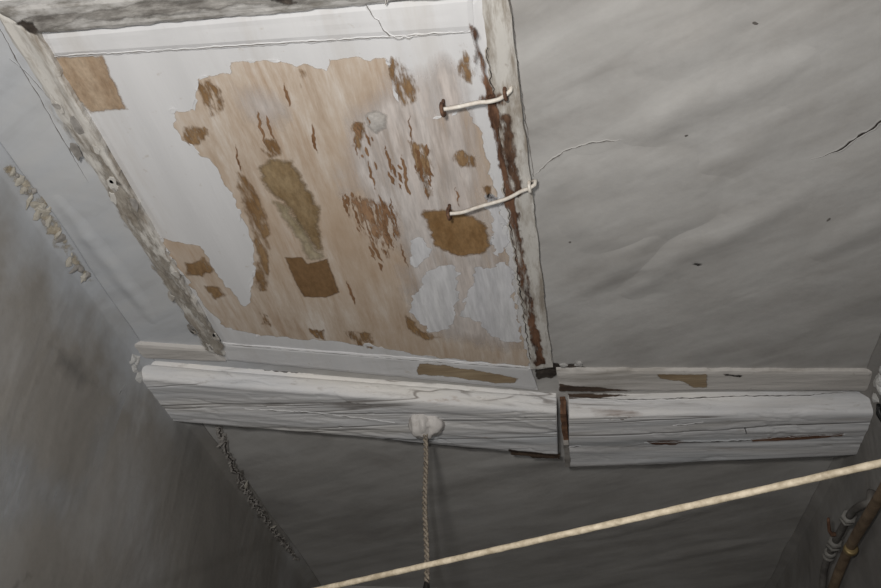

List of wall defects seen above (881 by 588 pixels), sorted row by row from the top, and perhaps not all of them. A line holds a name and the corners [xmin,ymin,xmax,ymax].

flaking render [4,166,91,283]
peeling [159,57,583,383]
rust [469,25,545,367]
crack [812,118,881,159]
peeling [658,374,707,388]